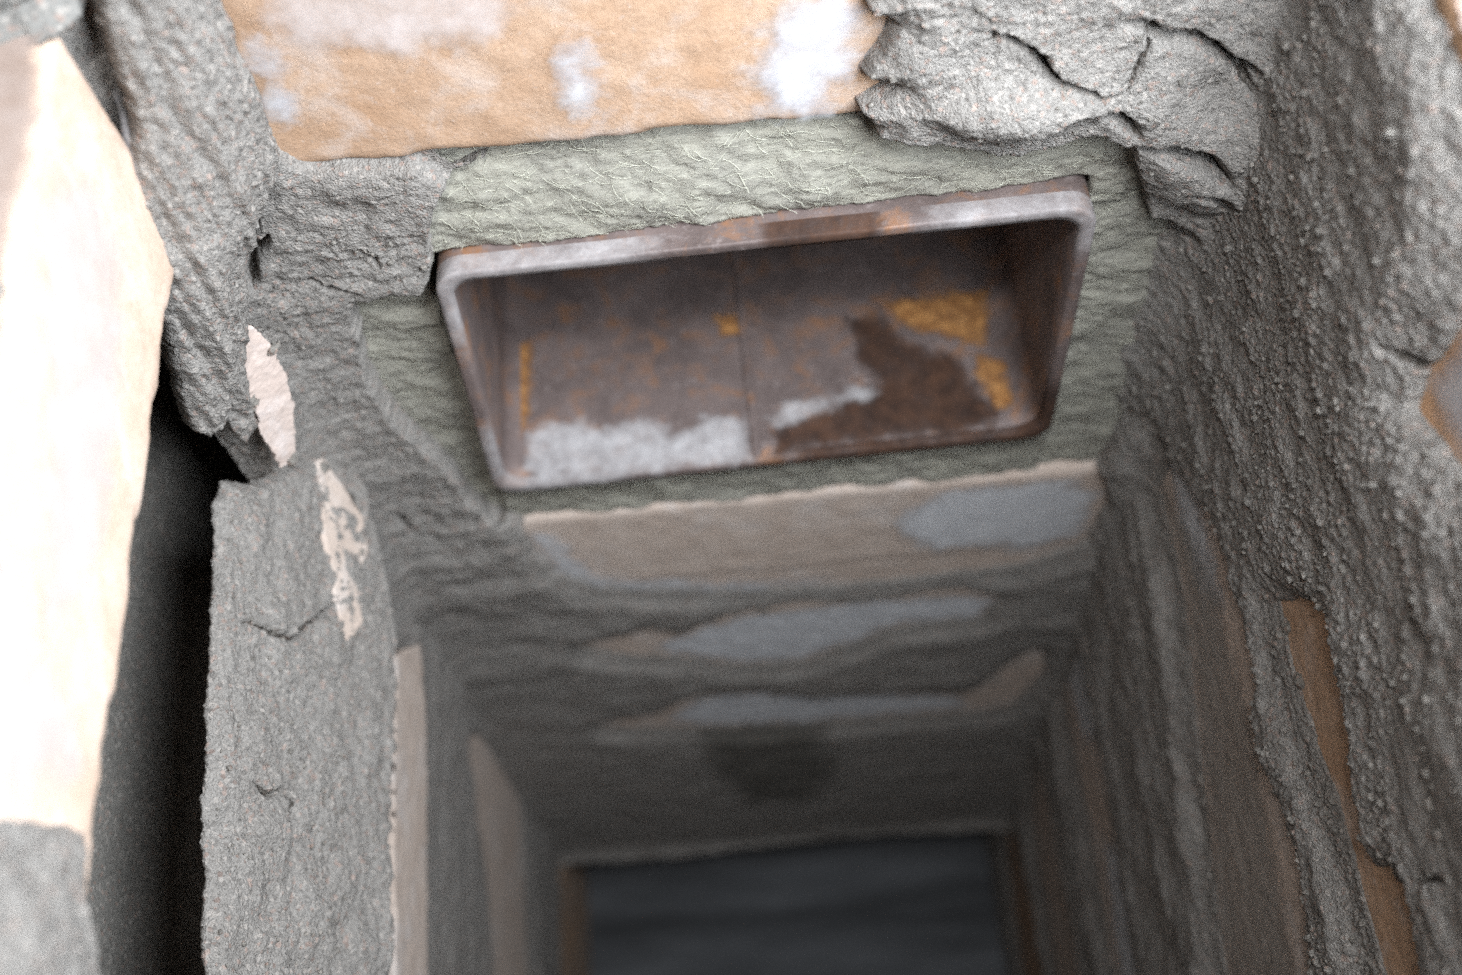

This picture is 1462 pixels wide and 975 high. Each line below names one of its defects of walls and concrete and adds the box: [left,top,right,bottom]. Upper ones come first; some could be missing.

crack [991,20,1264,134]
crack [1185,148,1231,182]
corrosion [766,212,876,249]
corrosion [717,315,739,335]
corrosion [521,344,532,425]
corrosion [776,290,1058,462]
spalling [584,588,998,664]
spalling [600,649,1044,728]
spalling [1281,597,1420,975]